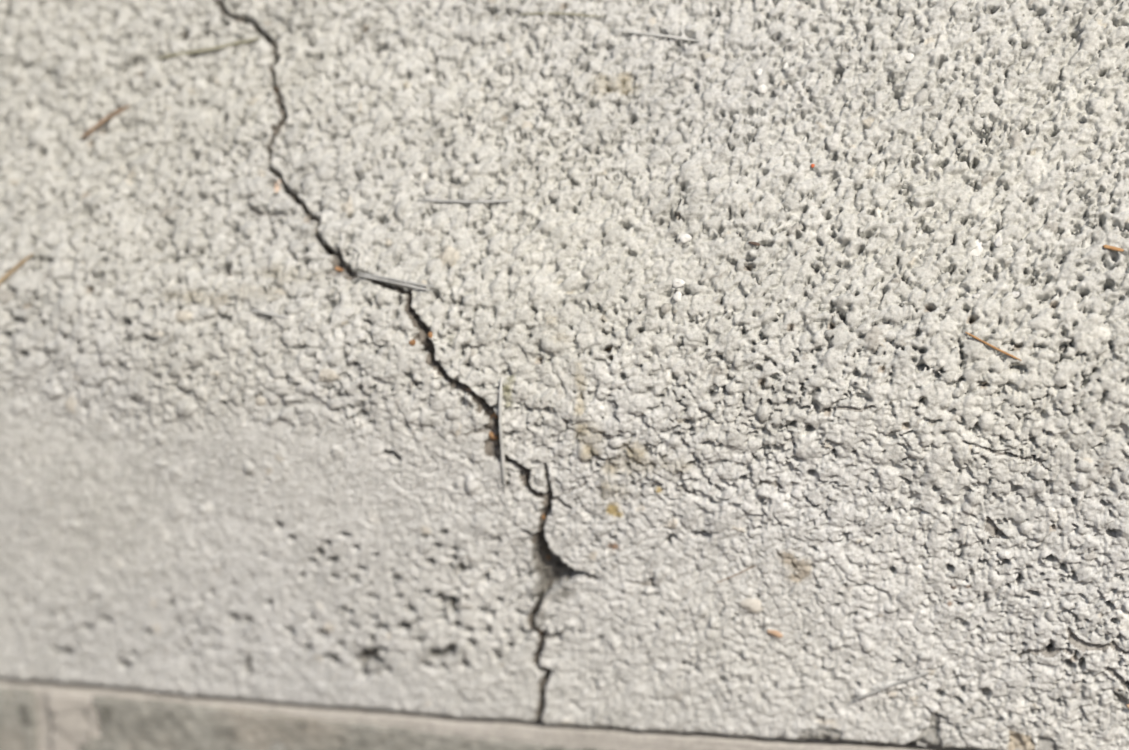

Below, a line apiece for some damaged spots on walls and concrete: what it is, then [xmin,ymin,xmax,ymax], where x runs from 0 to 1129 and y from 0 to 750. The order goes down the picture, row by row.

crack [215,0,620,720]
crack [627,578,657,587]